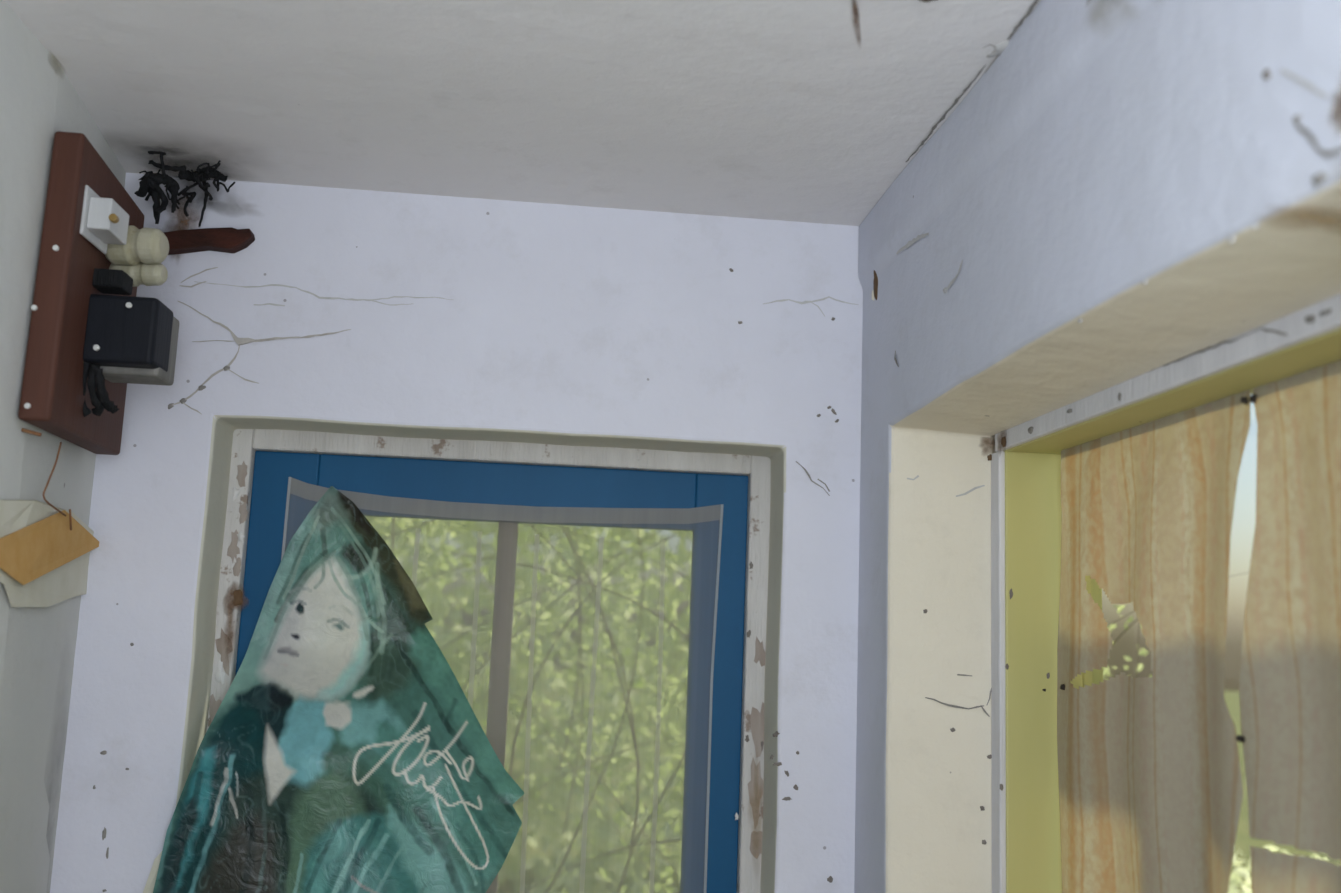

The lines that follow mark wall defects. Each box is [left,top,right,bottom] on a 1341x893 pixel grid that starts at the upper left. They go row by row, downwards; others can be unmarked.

crack [194,281,452,306]
crack [764,296,859,316]
peeling [746,630,766,667]
peeling [735,702,798,859]